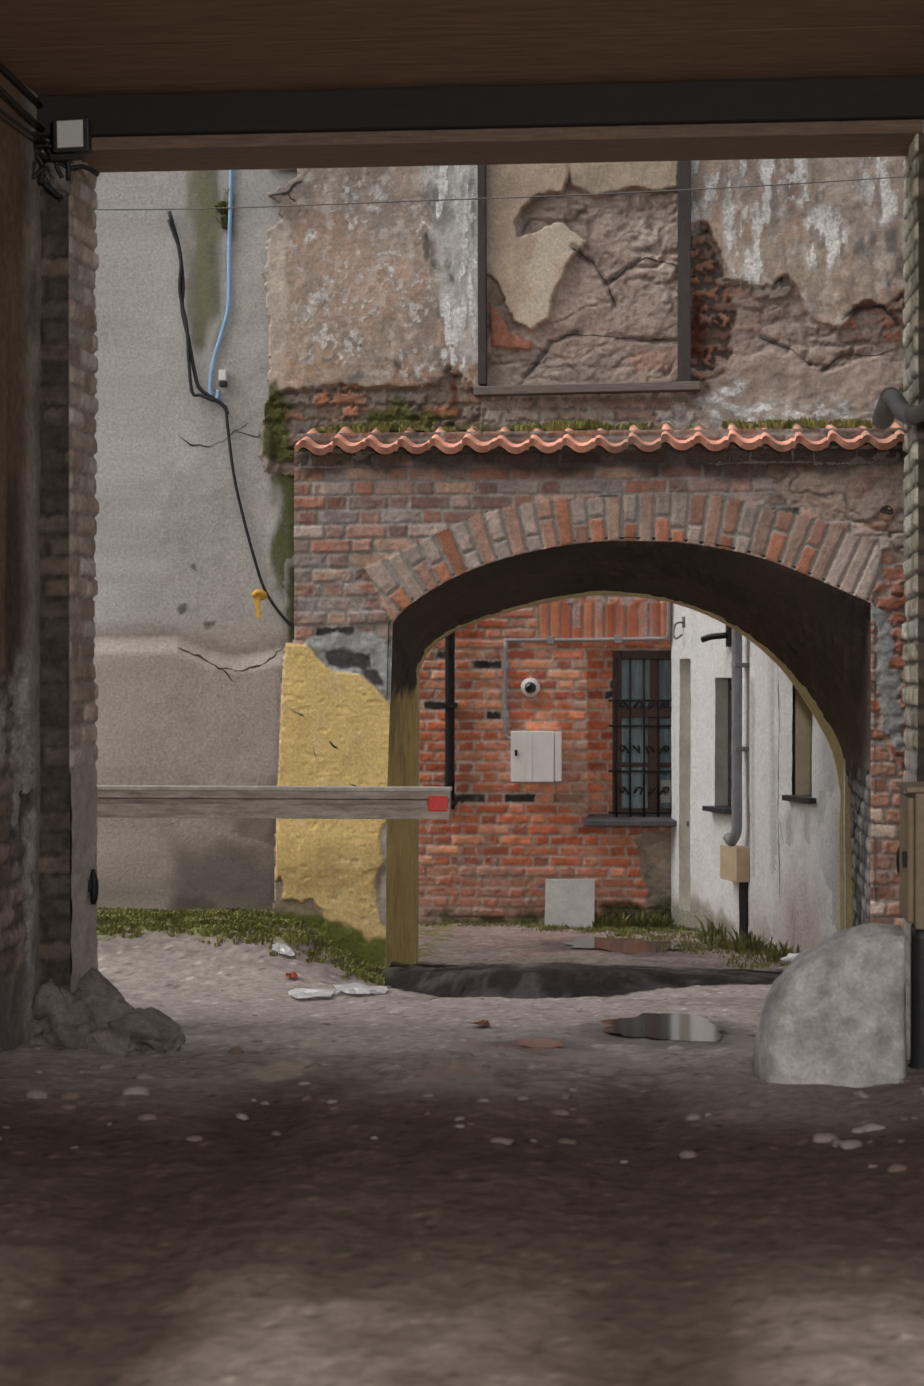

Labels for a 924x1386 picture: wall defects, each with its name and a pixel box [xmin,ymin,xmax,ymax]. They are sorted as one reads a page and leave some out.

spalling [269,157,907,475]
leakage [271,474,294,640]
crack [177,647,283,682]